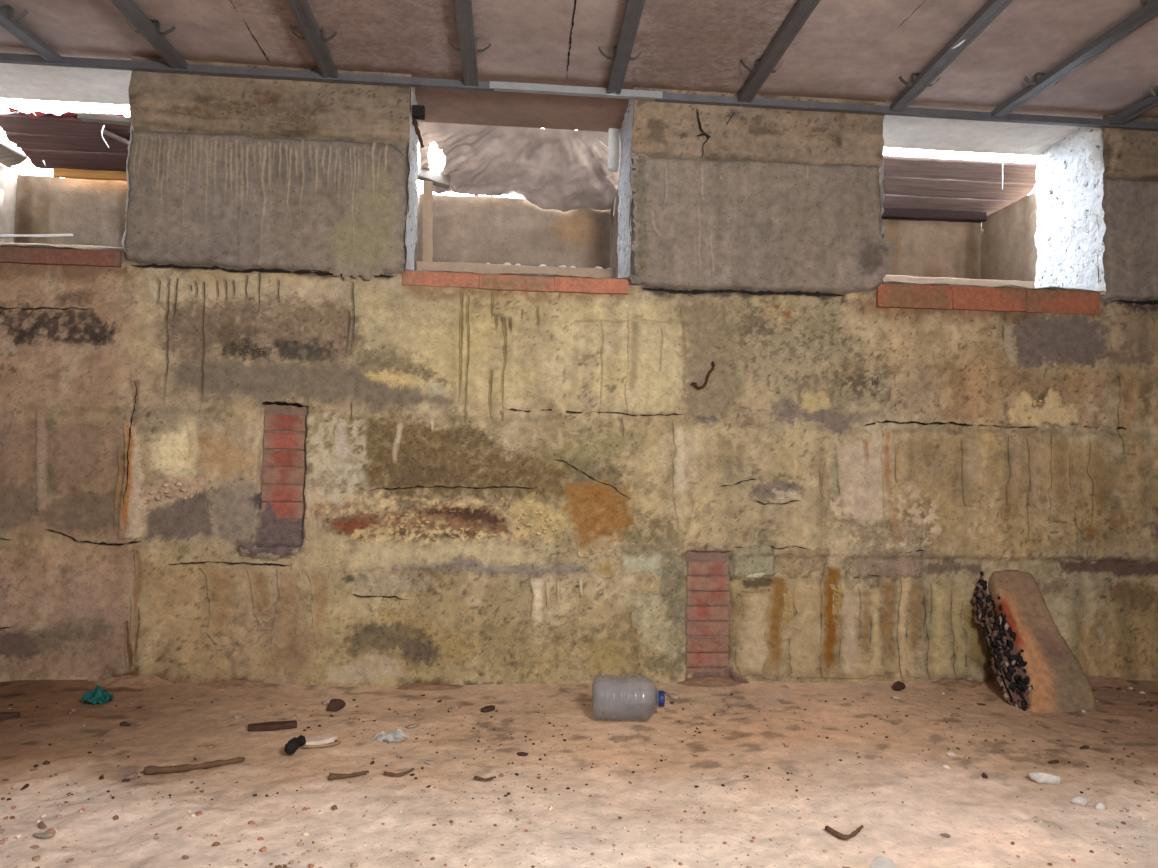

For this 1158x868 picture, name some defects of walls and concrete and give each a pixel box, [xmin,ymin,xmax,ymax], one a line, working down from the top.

crack [566,0,577,82]
water stain [0,285,125,350]
water stain [133,86,989,686]
crack [864,420,1036,428]
crack [47,529,141,546]
crack [171,559,290,567]
water stain [0,612,118,666]
corrosion [762,574,794,681]
corrosion [820,565,844,678]